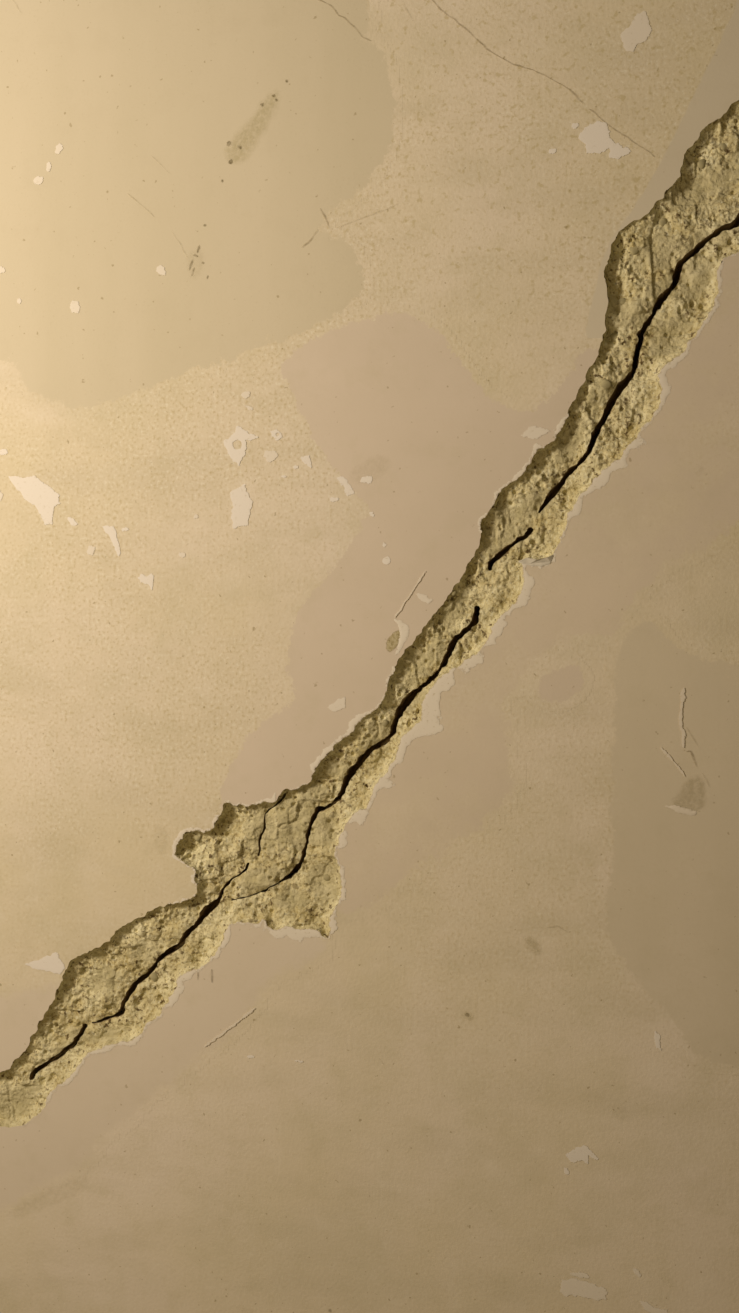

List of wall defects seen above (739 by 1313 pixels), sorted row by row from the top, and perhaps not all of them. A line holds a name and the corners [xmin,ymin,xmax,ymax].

peeling [620,11,652,52]
crack [29,606,480,1080]
flaking render [0,100,739,1128]
crack [487,213,739,571]